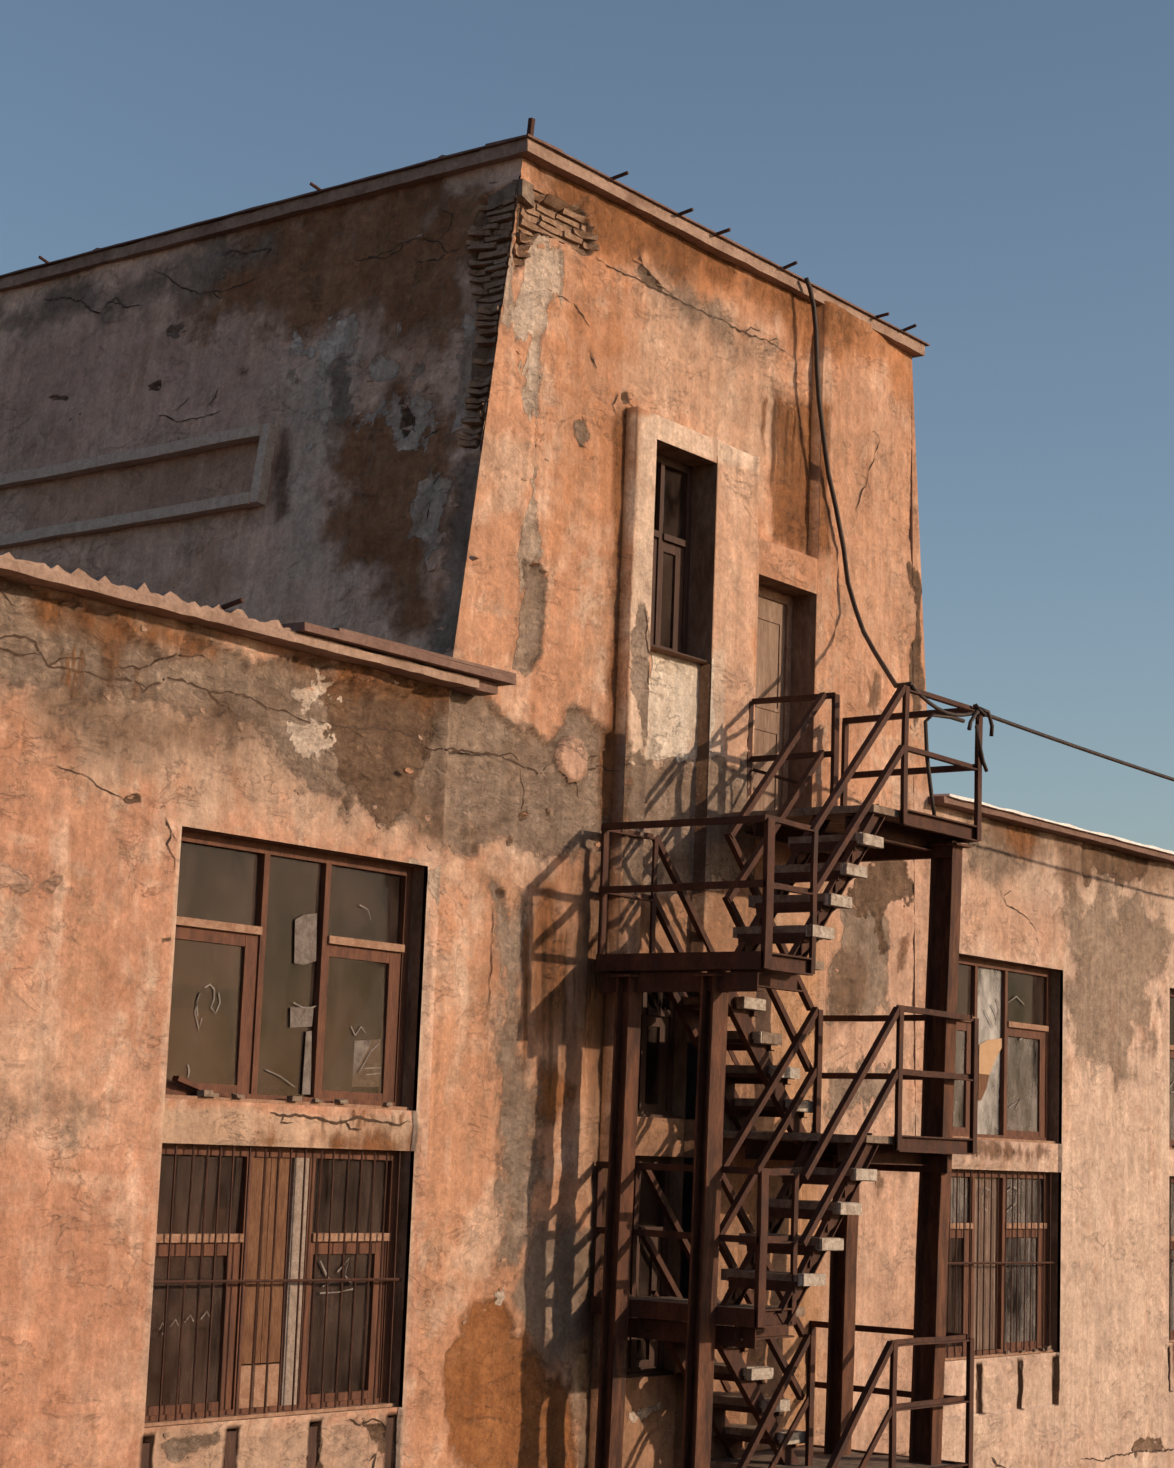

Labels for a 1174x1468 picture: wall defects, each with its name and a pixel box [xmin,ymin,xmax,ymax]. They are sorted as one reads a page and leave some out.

crack [596,257,796,360]
flaking render [320,180,600,676]
crack [0,587,616,816]
leakage [280,666,343,762]
flaking render [0,580,757,904]
flaking render [827,860,914,1025]
peeling [444,881,594,1468]
crack [1081,1447,1174,1462]